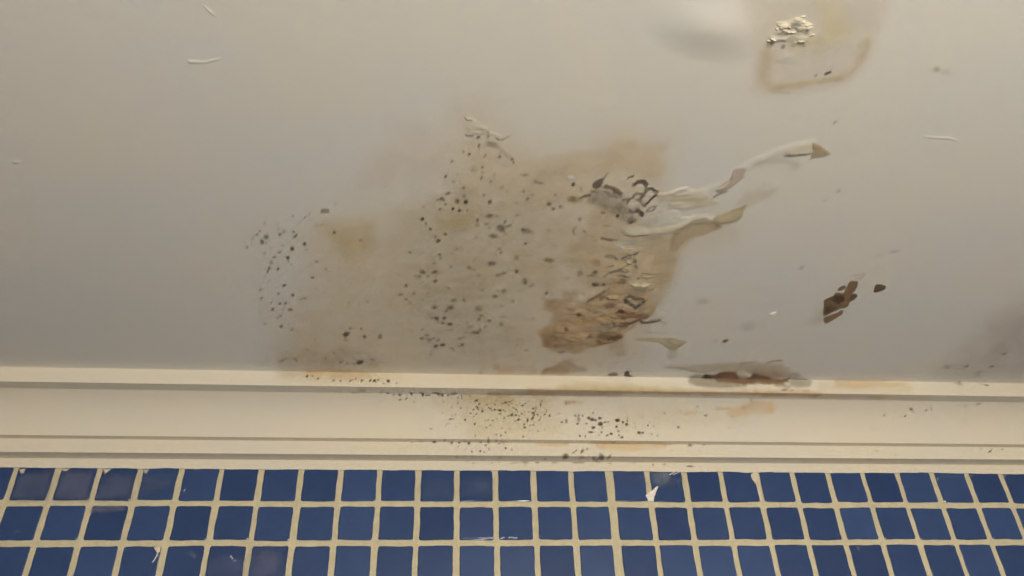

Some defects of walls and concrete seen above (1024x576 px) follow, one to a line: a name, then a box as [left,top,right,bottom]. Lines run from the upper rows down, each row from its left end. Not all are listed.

flaking render [758,15,816,51]
damp [580,146,665,220]
damp [577,229,669,300]
flaking render [541,138,830,352]
peeling [823,281,858,323]